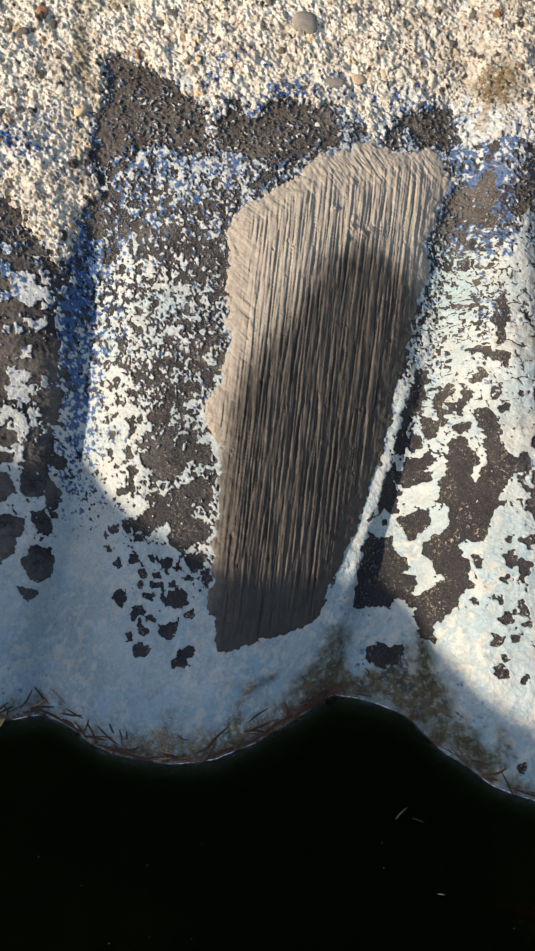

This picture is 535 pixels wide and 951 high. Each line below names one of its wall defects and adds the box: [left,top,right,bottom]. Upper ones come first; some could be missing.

peeling [0,54,535,685]
leakage [160,717,267,764]